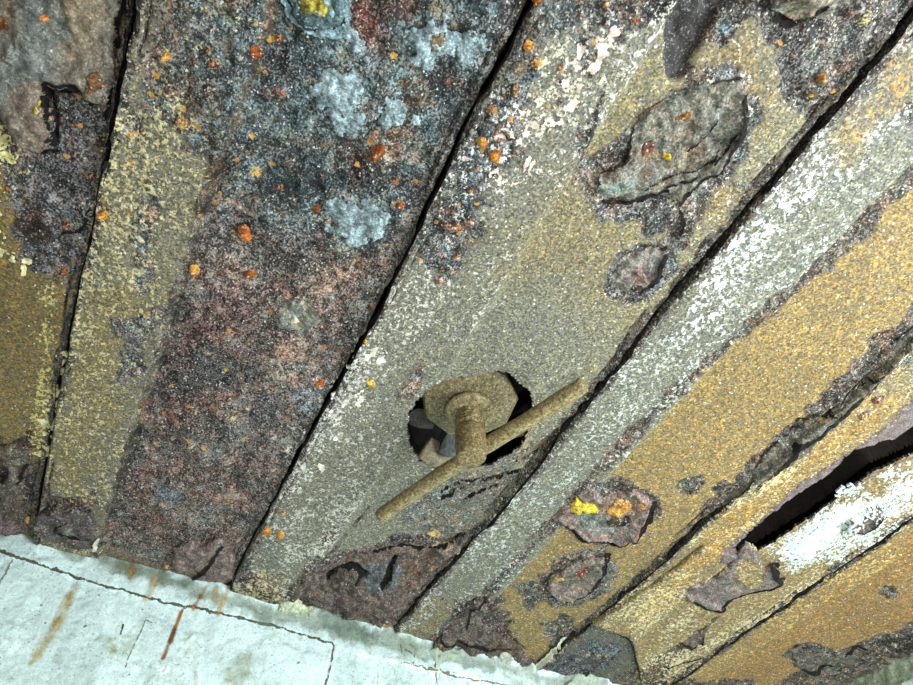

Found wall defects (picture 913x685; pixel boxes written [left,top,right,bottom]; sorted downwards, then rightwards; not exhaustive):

rust [0,0,126,154]
rust [280,0,352,40]
leakage [302,26,371,137]
leakage [403,18,493,76]
crack [58,161,110,240]
leakage [323,196,394,247]
rust [594,77,749,237]
peeling [685,218,775,331]
crack [440,416,582,500]
peeling [772,453,913,567]
crack [0,550,335,685]
rust [162,529,237,660]